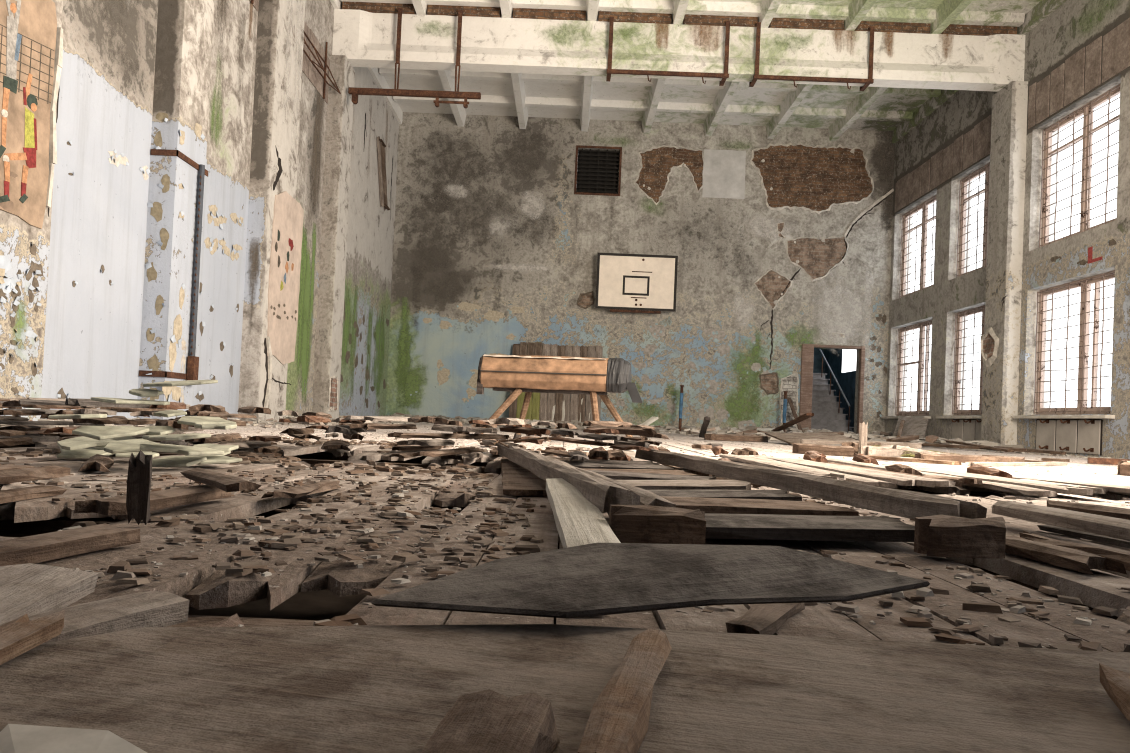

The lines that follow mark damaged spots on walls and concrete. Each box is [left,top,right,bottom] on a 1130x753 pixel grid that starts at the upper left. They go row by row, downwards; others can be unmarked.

peeling [0,242,43,371]
peeling [108,150,185,250]
peeling [146,262,157,282]
peeling [146,284,185,403]
leakage [297,225,316,400]
leakage [351,285,385,393]
leakage [399,298,426,408]
leakage [410,130,555,298]
spalling [634,145,704,206]
spalling [754,269,793,309]
spalling [750,143,874,281]
crack [760,189,894,370]